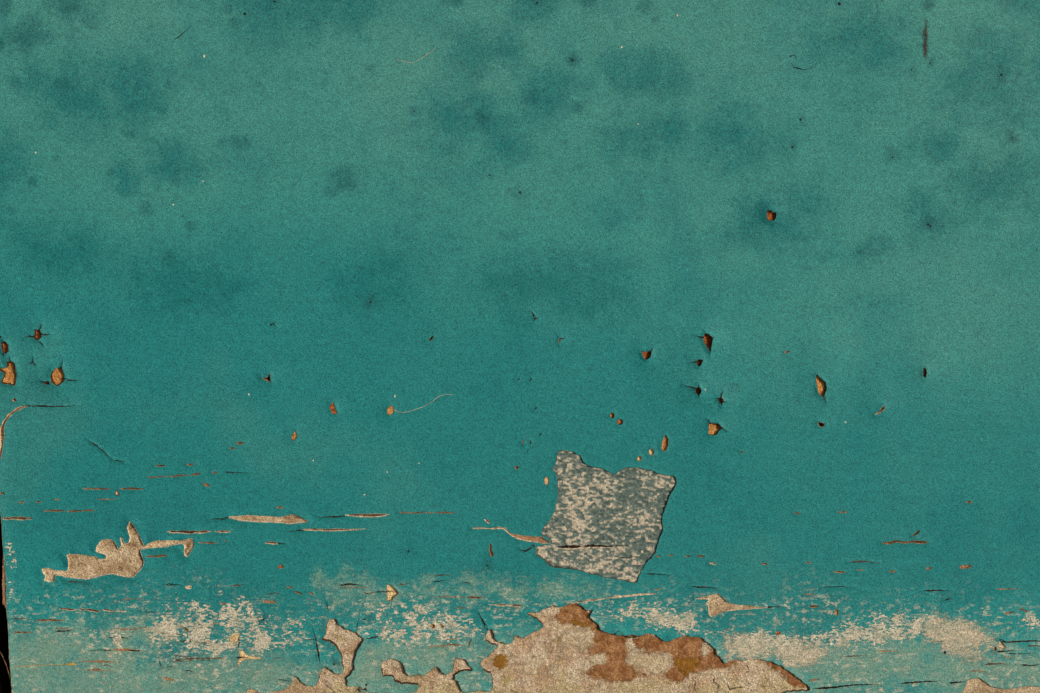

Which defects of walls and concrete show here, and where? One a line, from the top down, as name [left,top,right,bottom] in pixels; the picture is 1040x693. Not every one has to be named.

water stain [0,0,262,325]
water stain [195,0,407,57]
water stain [411,0,605,182]
water stain [804,0,1040,271]
peeling [36,516,200,587]
crack [0,401,247,693]
water stain [12,587,324,693]
peeling [219,598,814,693]
peeling [468,433,679,586]
water stain [307,563,1040,693]
peeling [691,590,782,621]
peeling [960,675,1040,693]